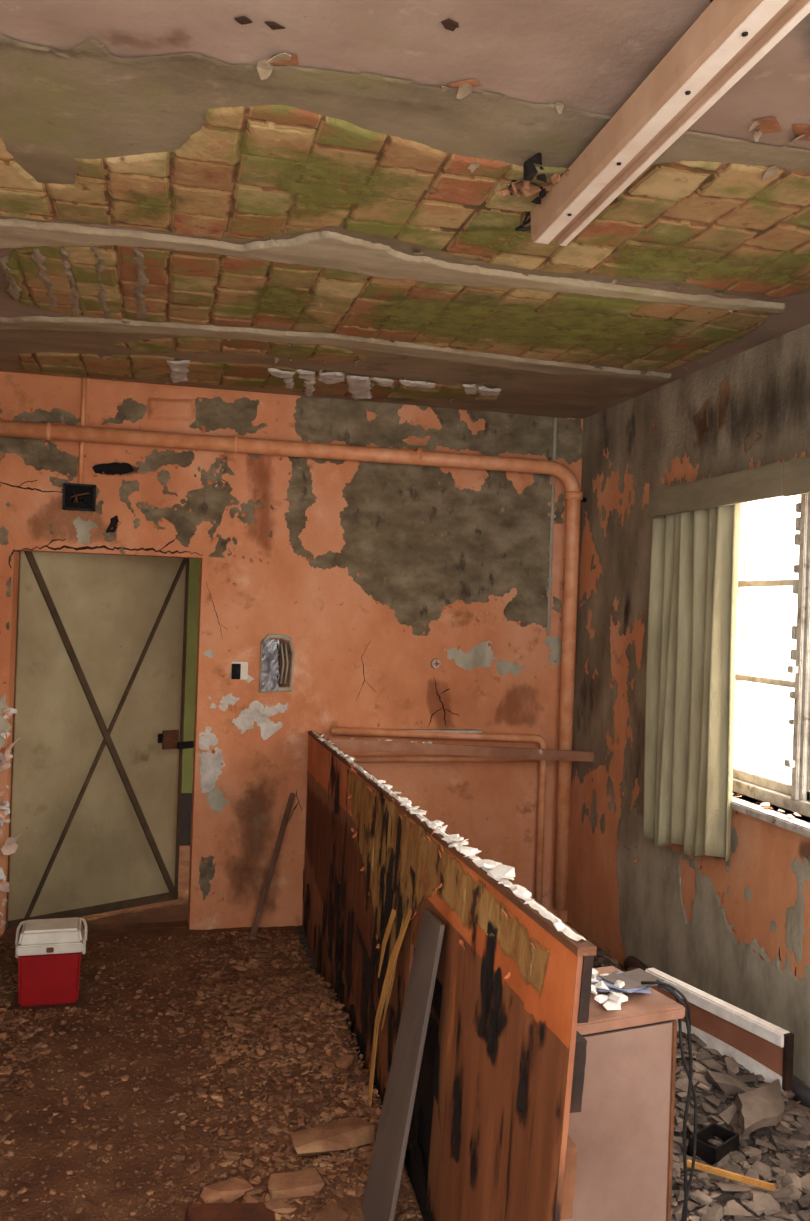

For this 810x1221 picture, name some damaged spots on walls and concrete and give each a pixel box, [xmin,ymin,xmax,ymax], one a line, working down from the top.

flaking render [0,105,810,298]
flaking render [0,245,810,1087]